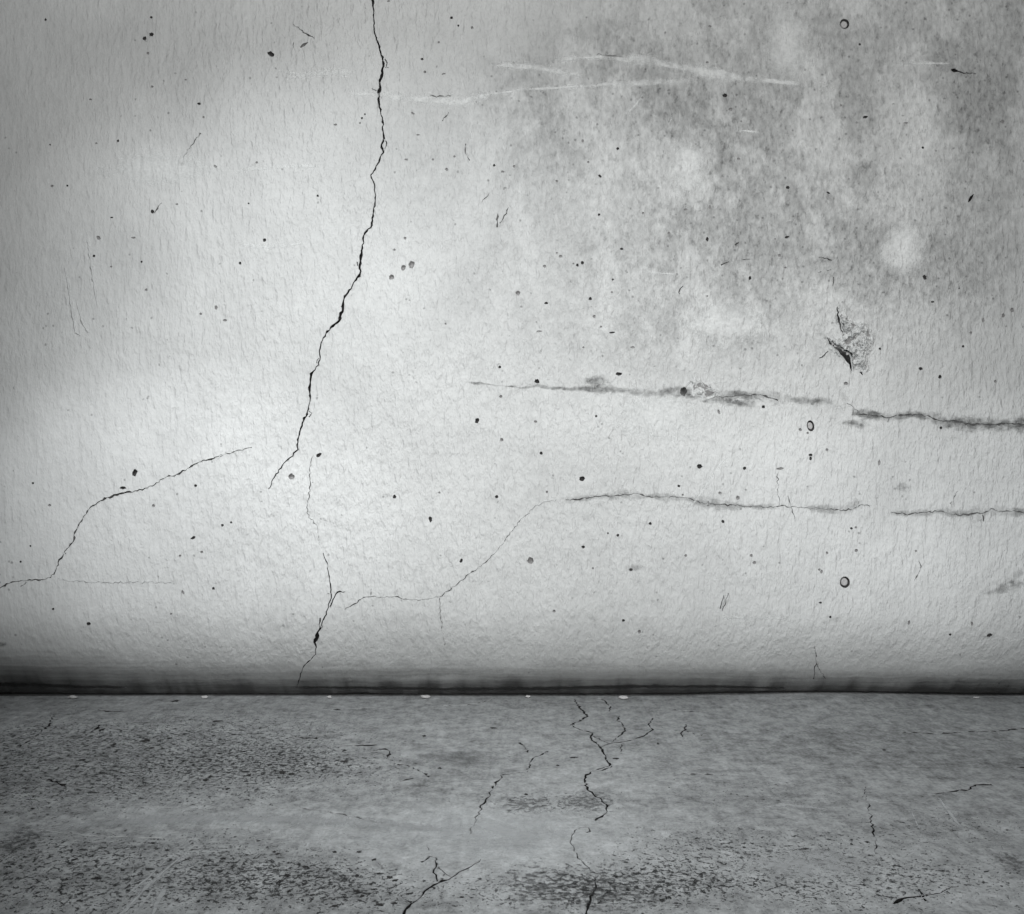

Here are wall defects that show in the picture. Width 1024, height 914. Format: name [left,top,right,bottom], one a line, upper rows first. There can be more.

crack [268,0,1024,686]
spalling [827,308,881,385]
crack [0,446,252,589]
crack [267,806,481,914]
crack [469,742,548,835]
crack [568,698,708,914]